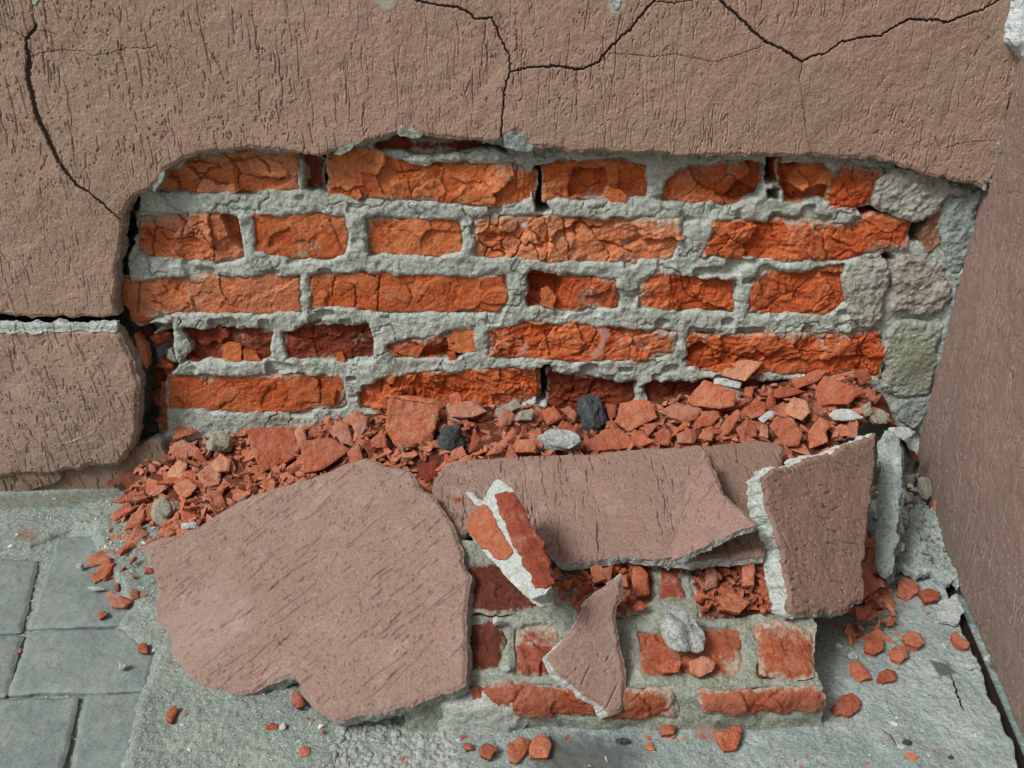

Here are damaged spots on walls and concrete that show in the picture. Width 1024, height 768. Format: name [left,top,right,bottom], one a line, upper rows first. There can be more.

crack [415,0,999,153]
crack [4,3,150,219]
crack [0,305,130,335]
spalling [110,125,983,538]
spalling [590,565,606,585]
spalling [631,564,650,612]
spalling [704,563,755,615]
spalling [861,502,970,652]
spalling [659,656,715,679]
spalling [849,631,924,685]
spalling [166,706,178,725]
spalling [291,691,305,710]